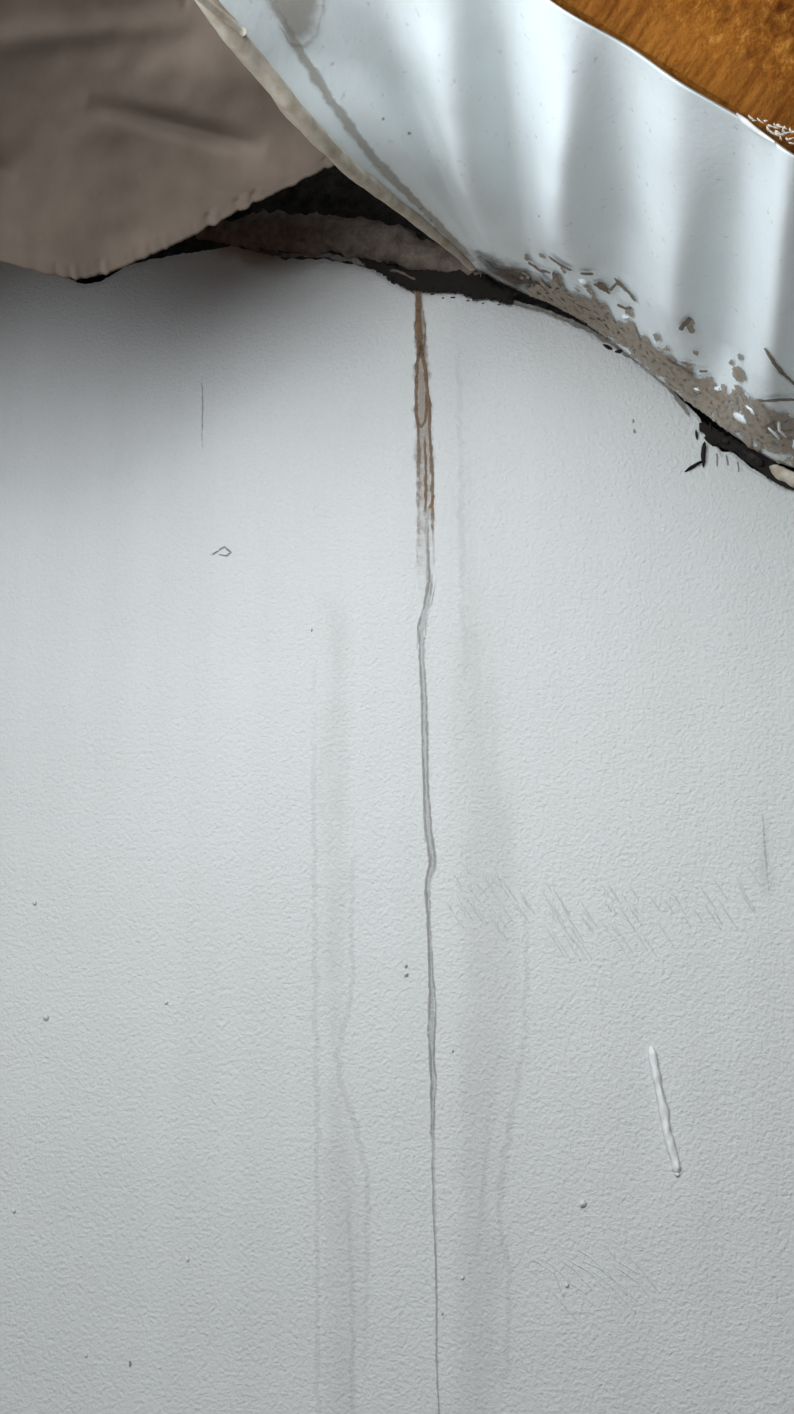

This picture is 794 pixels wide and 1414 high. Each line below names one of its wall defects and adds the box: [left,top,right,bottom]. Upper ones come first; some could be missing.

peeling [358,253,794,490]
crack [415,550,436,1100]